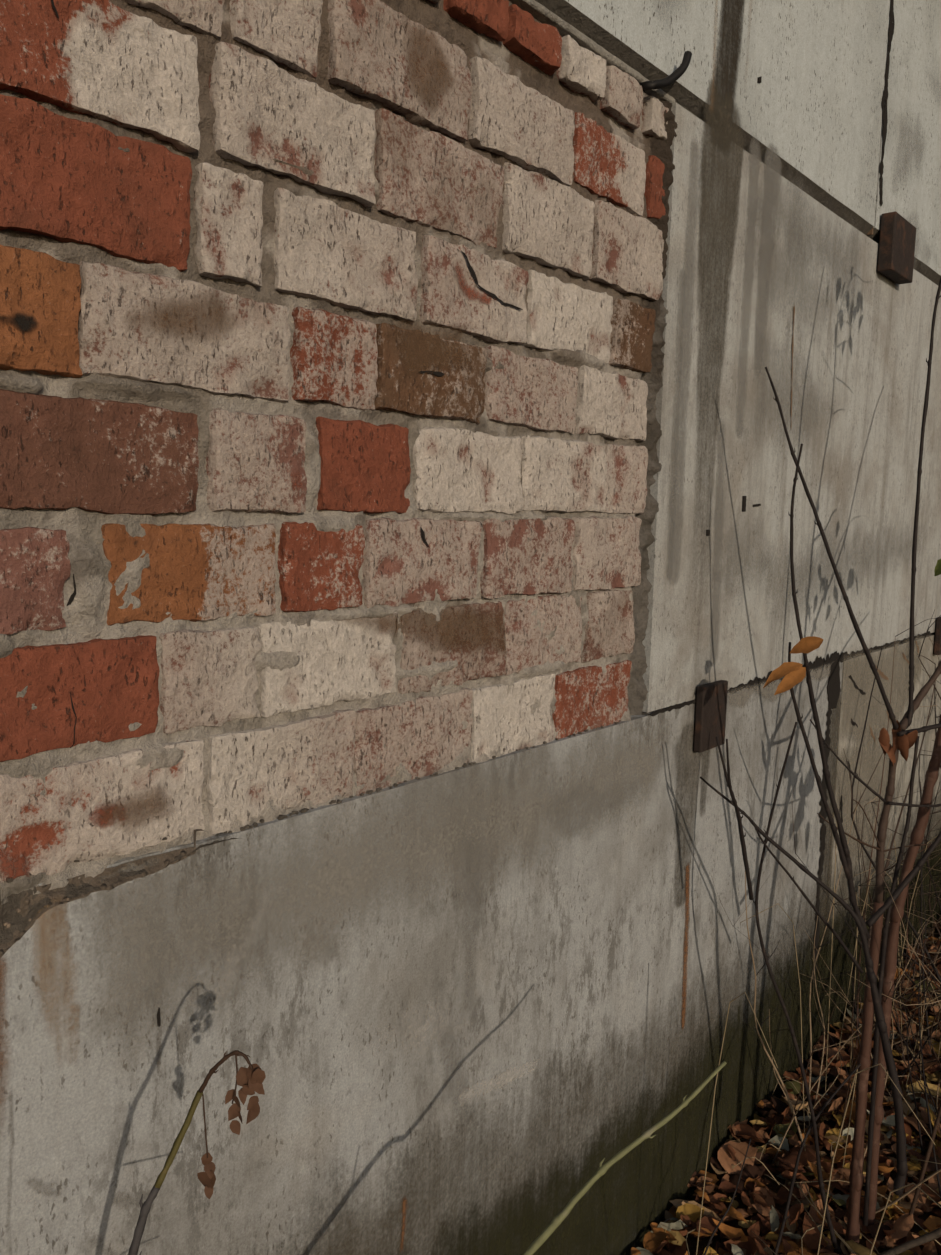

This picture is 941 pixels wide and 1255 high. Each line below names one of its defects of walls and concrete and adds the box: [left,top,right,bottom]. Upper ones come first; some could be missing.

crack [880,0,895,206]
damp [670,0,854,662]
spalling [0,805,314,958]
spalling [329,772,438,804]